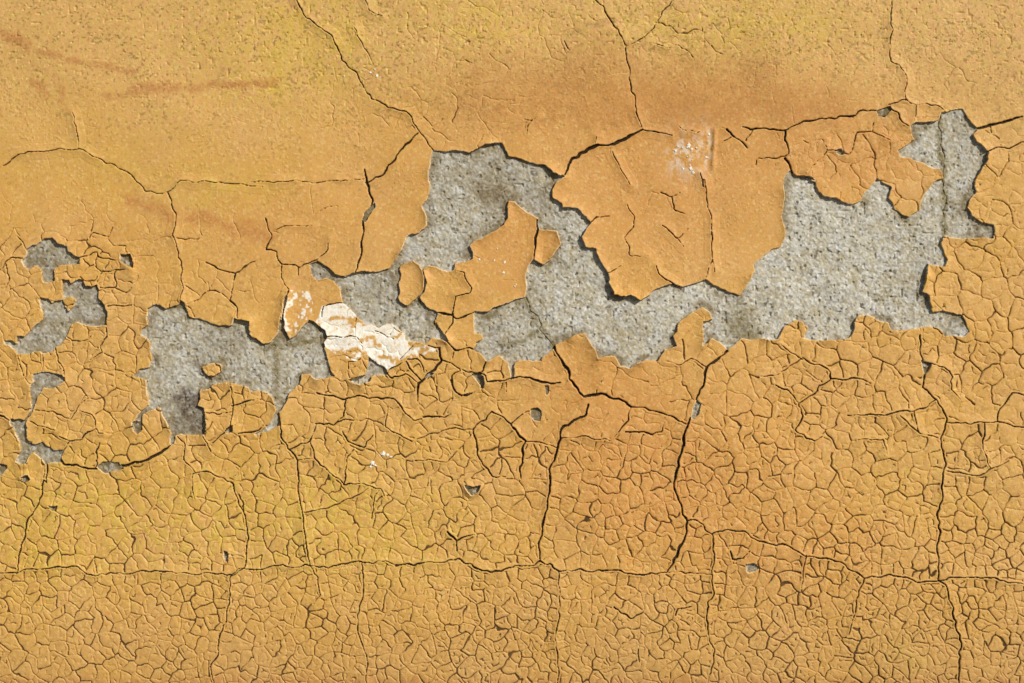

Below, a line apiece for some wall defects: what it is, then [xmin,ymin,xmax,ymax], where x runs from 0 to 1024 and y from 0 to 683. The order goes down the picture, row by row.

peeling [5,238,107,354]
peeling [120,254,133,268]
crack [3,0,458,316]
peeling [132,109,995,446]
crack [564,0,721,284]
crack [723,2,947,215]
crack [977,116,1024,186]
peeling [0,372,65,482]
peeling [98,461,124,473]
crack [0,199,1024,683]